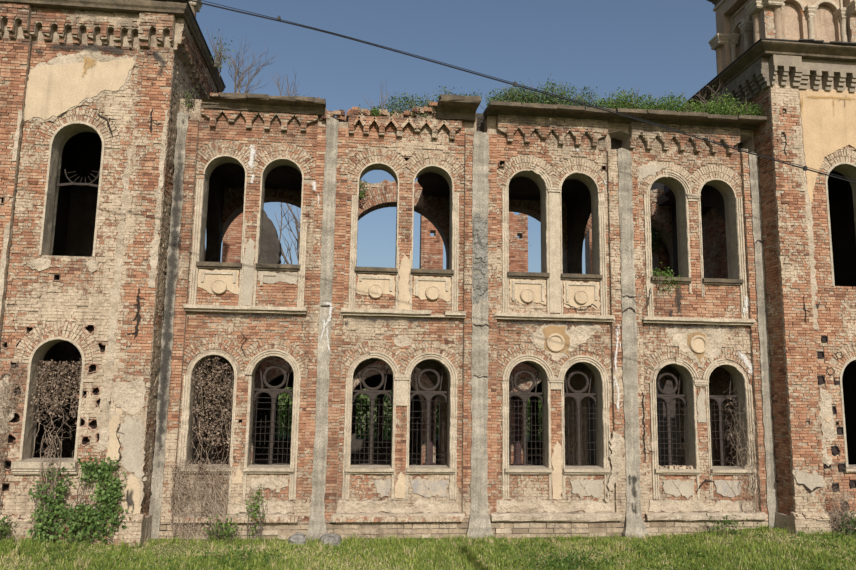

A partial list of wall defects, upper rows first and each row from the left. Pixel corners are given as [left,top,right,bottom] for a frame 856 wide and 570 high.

water stain [35,44,124,76]
flaking render [24,42,138,123]
crack [127,288,146,339]
water stain [320,302,332,351]
water stain [499,321,593,334]
flaking render [0,319,109,445]
water stain [608,330,621,411]
flaking render [75,376,151,516]
flaking render [792,467,827,497]
flaking render [810,387,840,466]